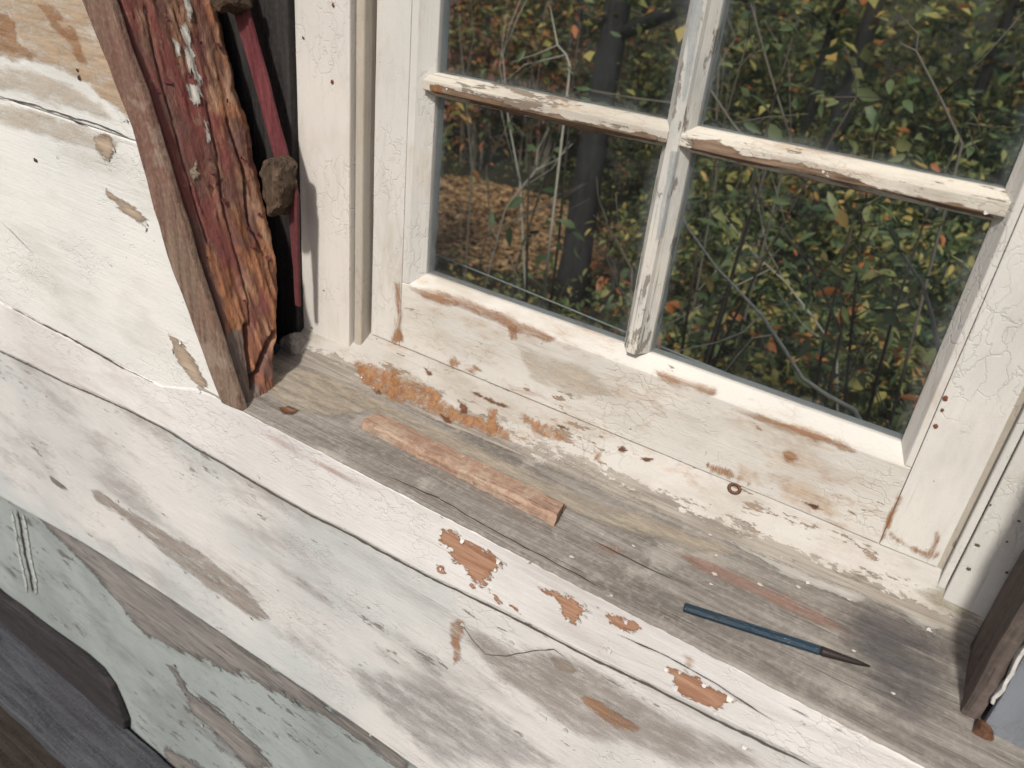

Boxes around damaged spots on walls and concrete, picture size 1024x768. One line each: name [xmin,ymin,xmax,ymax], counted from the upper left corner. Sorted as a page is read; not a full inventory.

crack [0,98,130,139]
peeling [104,187,148,231]
peeling [690,139,993,218]
peeling [168,333,207,393]
peeling [91,490,267,620]
peeling [41,519,409,768]
crack [0,351,810,766]
peeling [436,529,521,615]
peeling [537,586,641,634]
peeling [464,628,748,763]